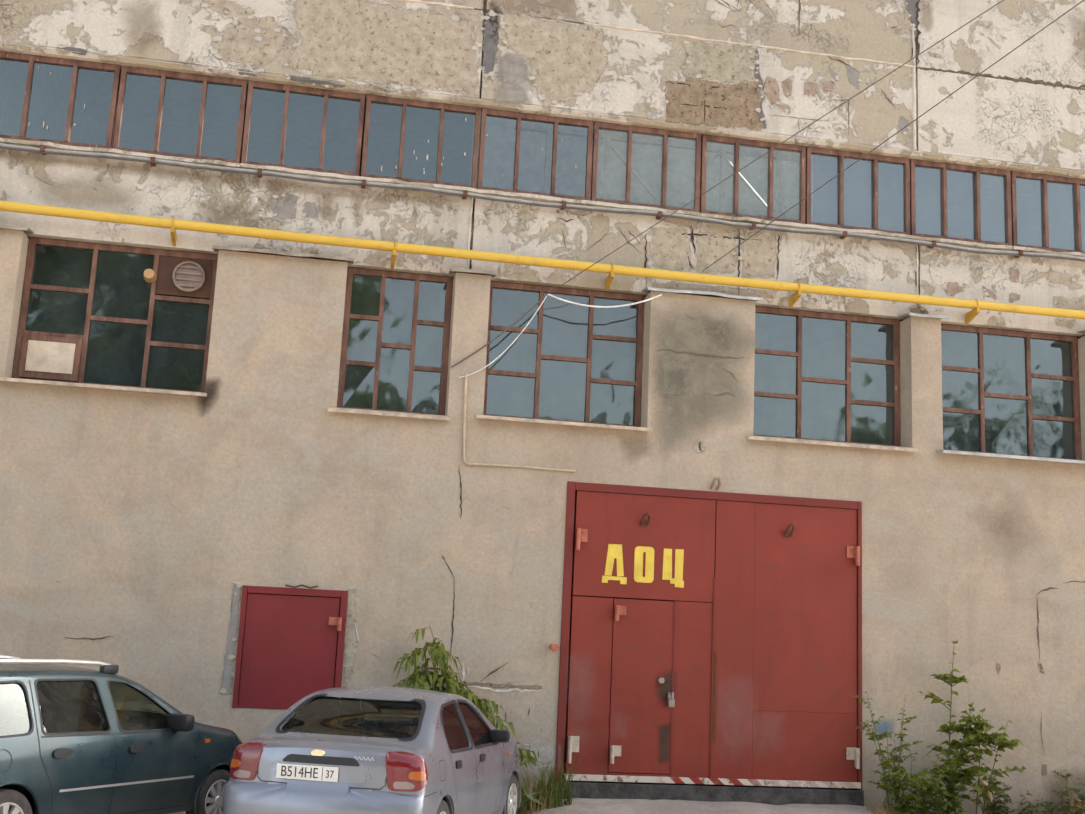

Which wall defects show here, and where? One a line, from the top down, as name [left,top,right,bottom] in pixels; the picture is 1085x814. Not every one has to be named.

spalling [59,44,87,55]
crack [482,0,494,33]
crack [891,0,921,64]
spalling [663,40,862,132]
peeling [269,193,322,223]
peeling [647,225,778,299]
peeling [943,282,963,297]
peeling [982,265,1023,303]
peeling [1048,270,1085,330]
crack [456,466,464,516]
crack [444,561,455,652]
crack [1037,581,1085,673]